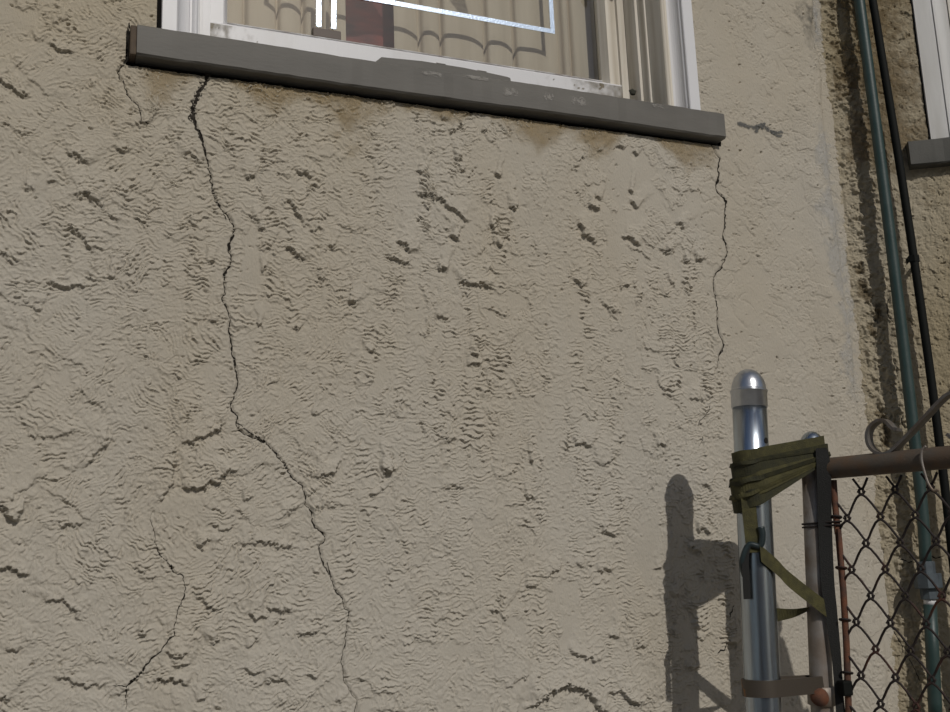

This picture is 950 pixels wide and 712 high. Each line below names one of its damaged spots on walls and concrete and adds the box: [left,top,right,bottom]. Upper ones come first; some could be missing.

crack [117,23,155,127]
crack [711,145,728,376]
crack [188,72,358,712]
crack [113,513,186,707]